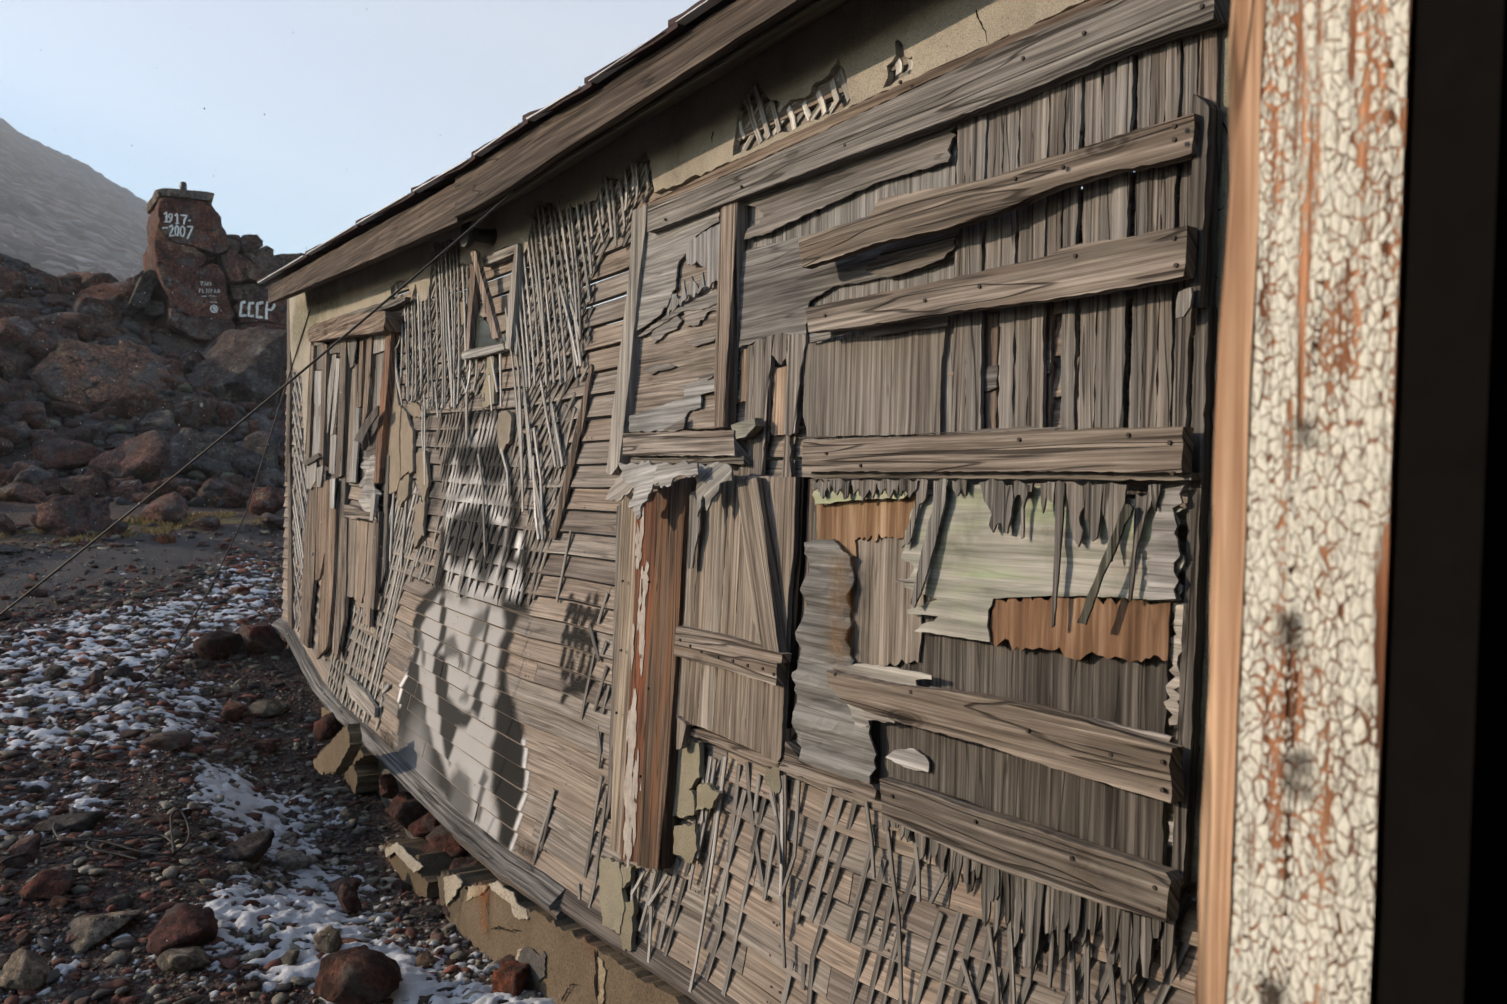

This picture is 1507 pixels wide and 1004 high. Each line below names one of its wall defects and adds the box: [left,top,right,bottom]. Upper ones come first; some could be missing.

flaking render [739,68,850,151]
flaking render [326,160,721,731]
flaking render [532,788,556,865]
flaking render [577,460,1193,1004]
peeling [1227,0,1409,1004]